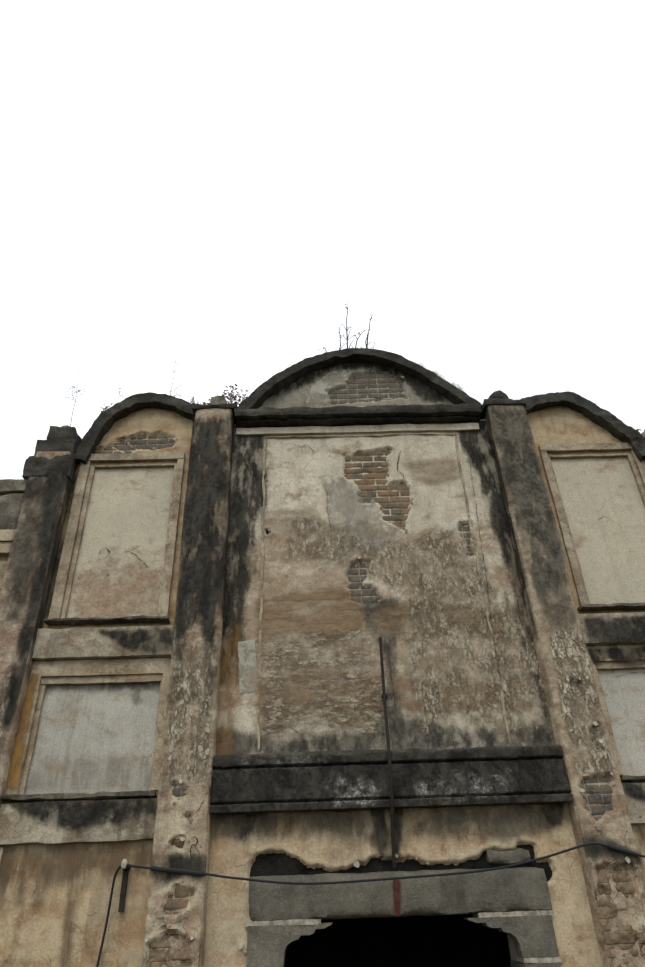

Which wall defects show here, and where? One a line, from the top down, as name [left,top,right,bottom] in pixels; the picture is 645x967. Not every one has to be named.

flaking render [325,371,407,406]
flaking render [94,430,177,454]
leakage [100,410,268,707]
leakage [209,405,645,858]
flaking render [250,844,552,881]
flaking render [145,888,194,967]
flaking render [594,856,645,967]